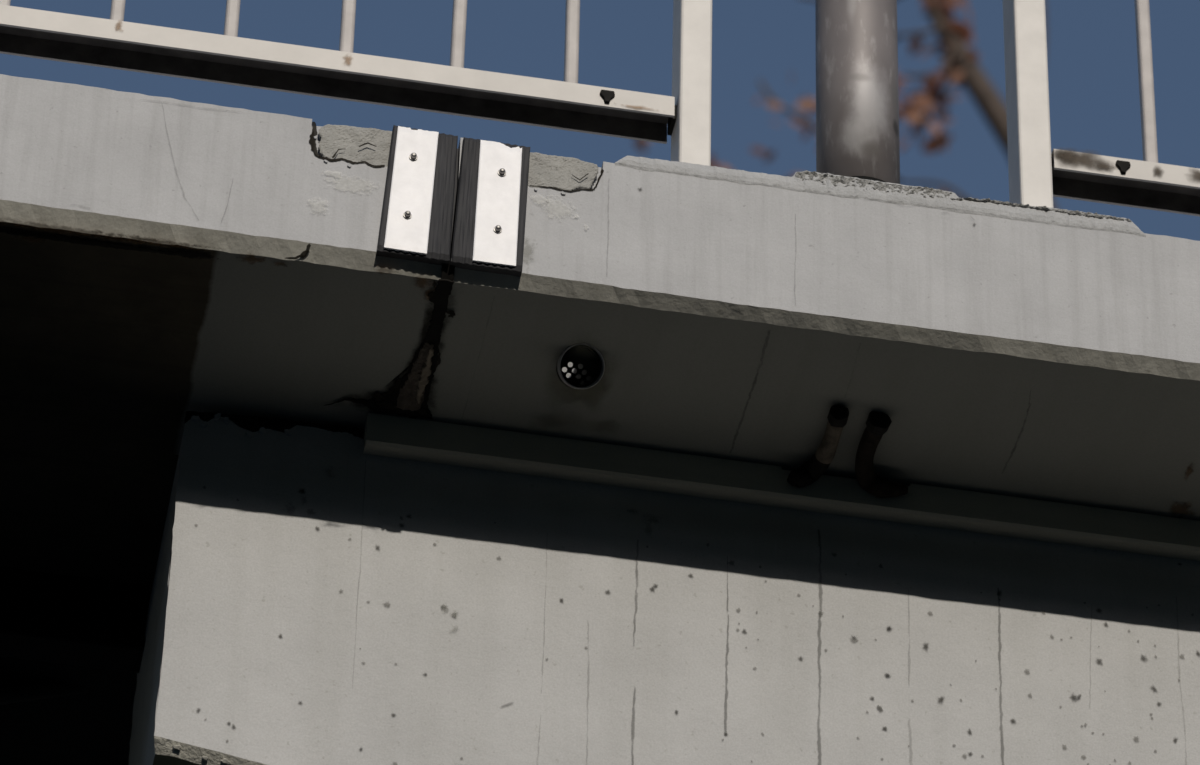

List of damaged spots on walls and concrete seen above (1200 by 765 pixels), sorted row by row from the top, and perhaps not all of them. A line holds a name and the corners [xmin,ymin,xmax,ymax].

spalling [309,122,392,168]
spalling [528,152,604,195]
crack [285,244,311,259]
crack [323,262,455,419]